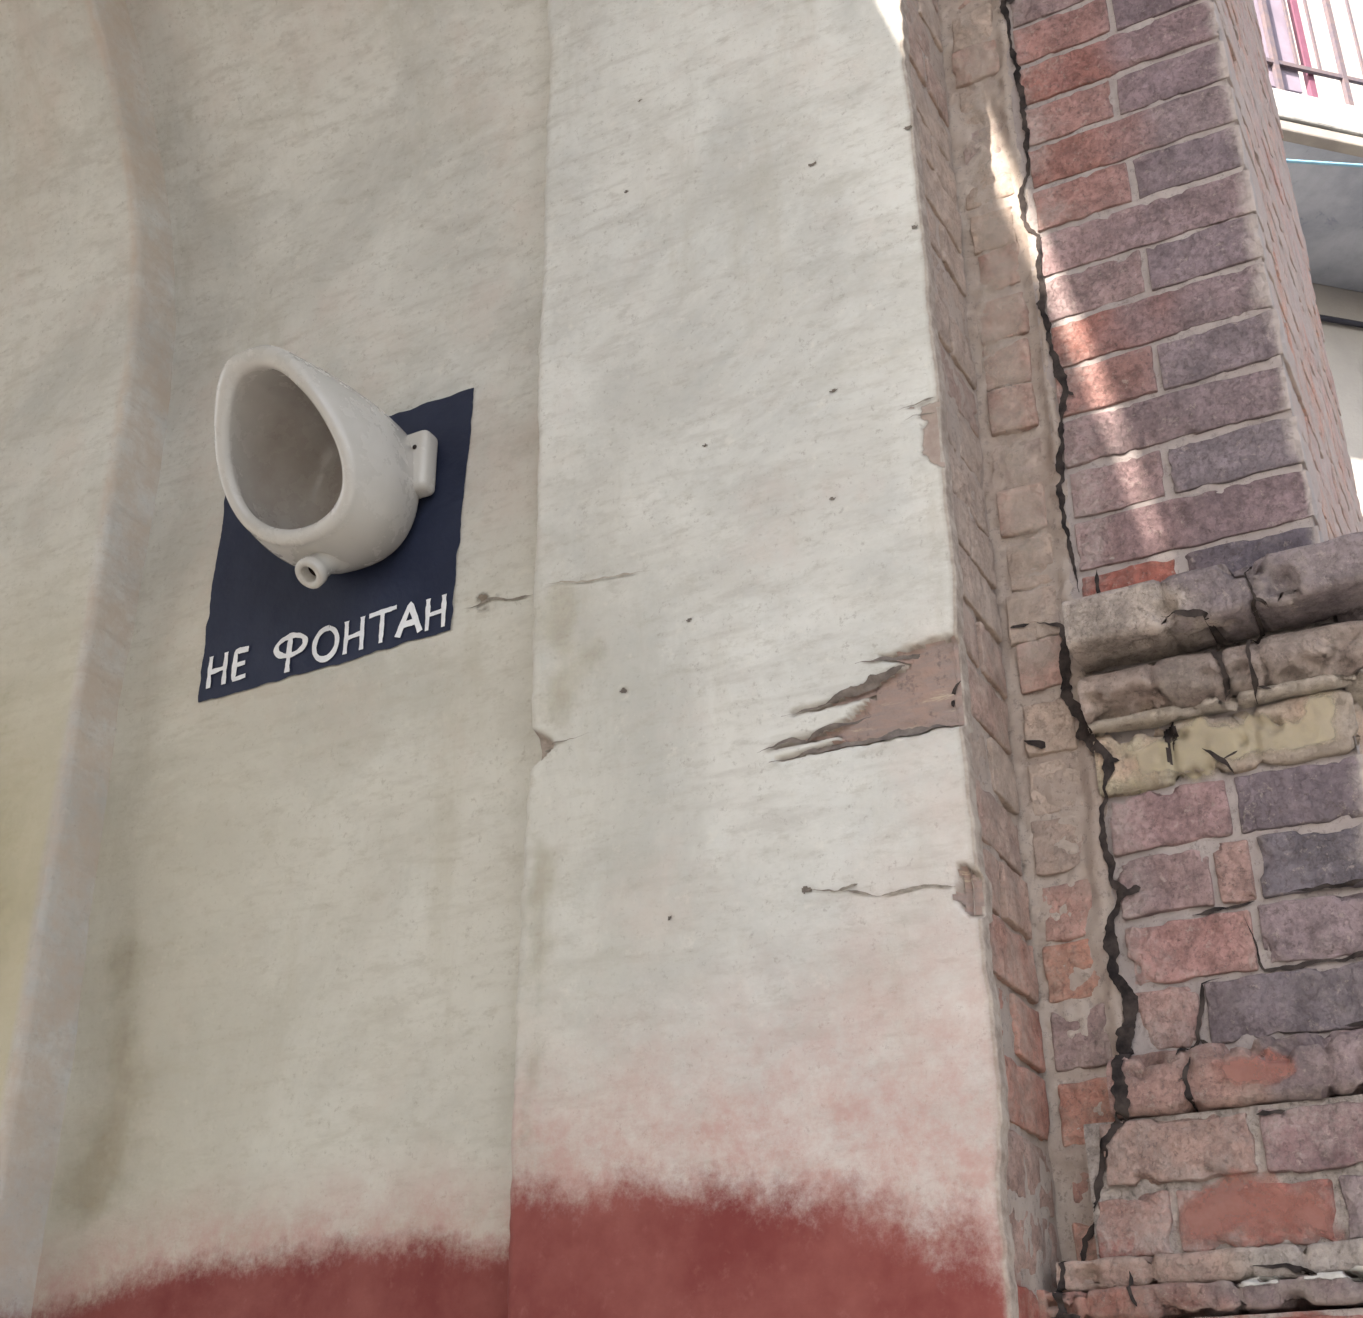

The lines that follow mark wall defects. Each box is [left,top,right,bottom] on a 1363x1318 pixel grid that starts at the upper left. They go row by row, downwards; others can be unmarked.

crack [1000,0,1101,594]
flaking render [757,636,965,762]
crack [1161,566,1271,704]
crack [808,884,956,896]